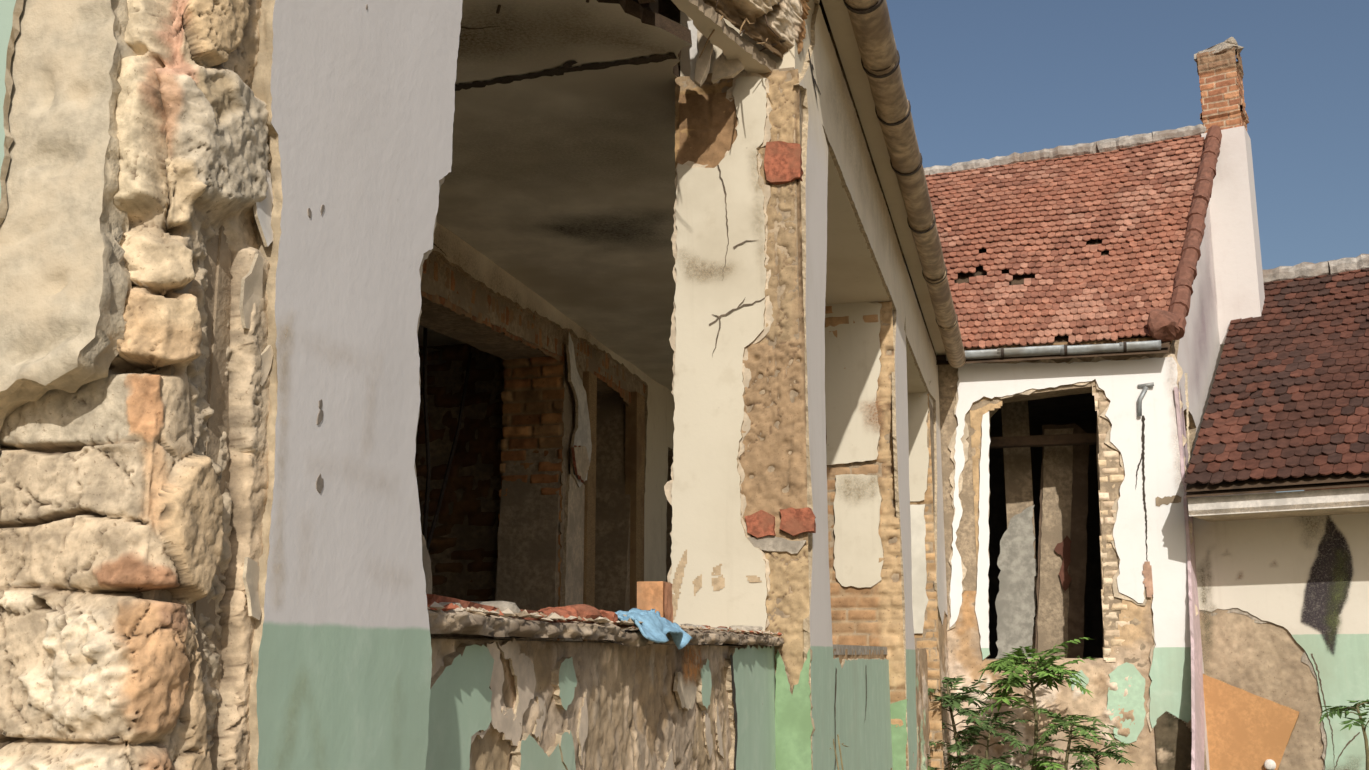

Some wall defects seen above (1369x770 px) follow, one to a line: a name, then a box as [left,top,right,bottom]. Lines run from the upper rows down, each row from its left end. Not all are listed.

crack [455,53,677,91]
crack [709,165,766,357]
flaking render [0,0,273,770]
flaking render [421,0,1158,770]
crack [1135,415,1182,561]
crack [1183,373,1191,464]
mould [1301,517,1353,654]
flaking render [1199,609,1325,770]